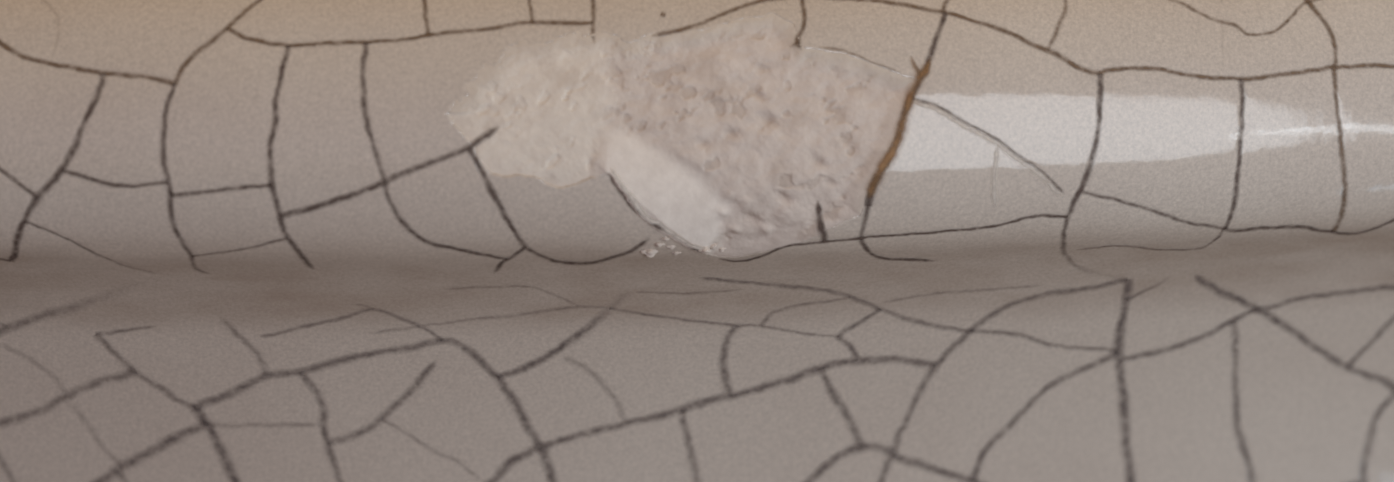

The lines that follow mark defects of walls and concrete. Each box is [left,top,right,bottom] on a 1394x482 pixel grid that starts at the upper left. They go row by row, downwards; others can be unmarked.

crack [0,0,645,270]
spalling [448,13,916,258]
crack [659,0,766,35]
crack [727,0,1394,283]
crack [98,385,248,482]
crack [287,279,1394,482]